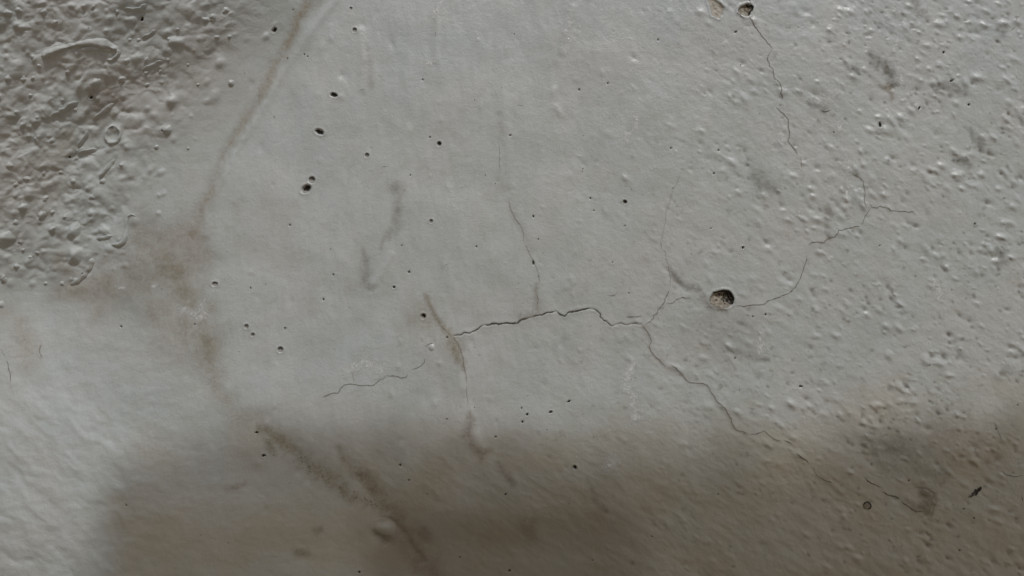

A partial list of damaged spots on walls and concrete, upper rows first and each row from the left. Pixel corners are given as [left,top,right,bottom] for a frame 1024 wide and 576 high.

crack [749,0,803,169]
crack [737,174,913,307]
crack [324,177,832,483]